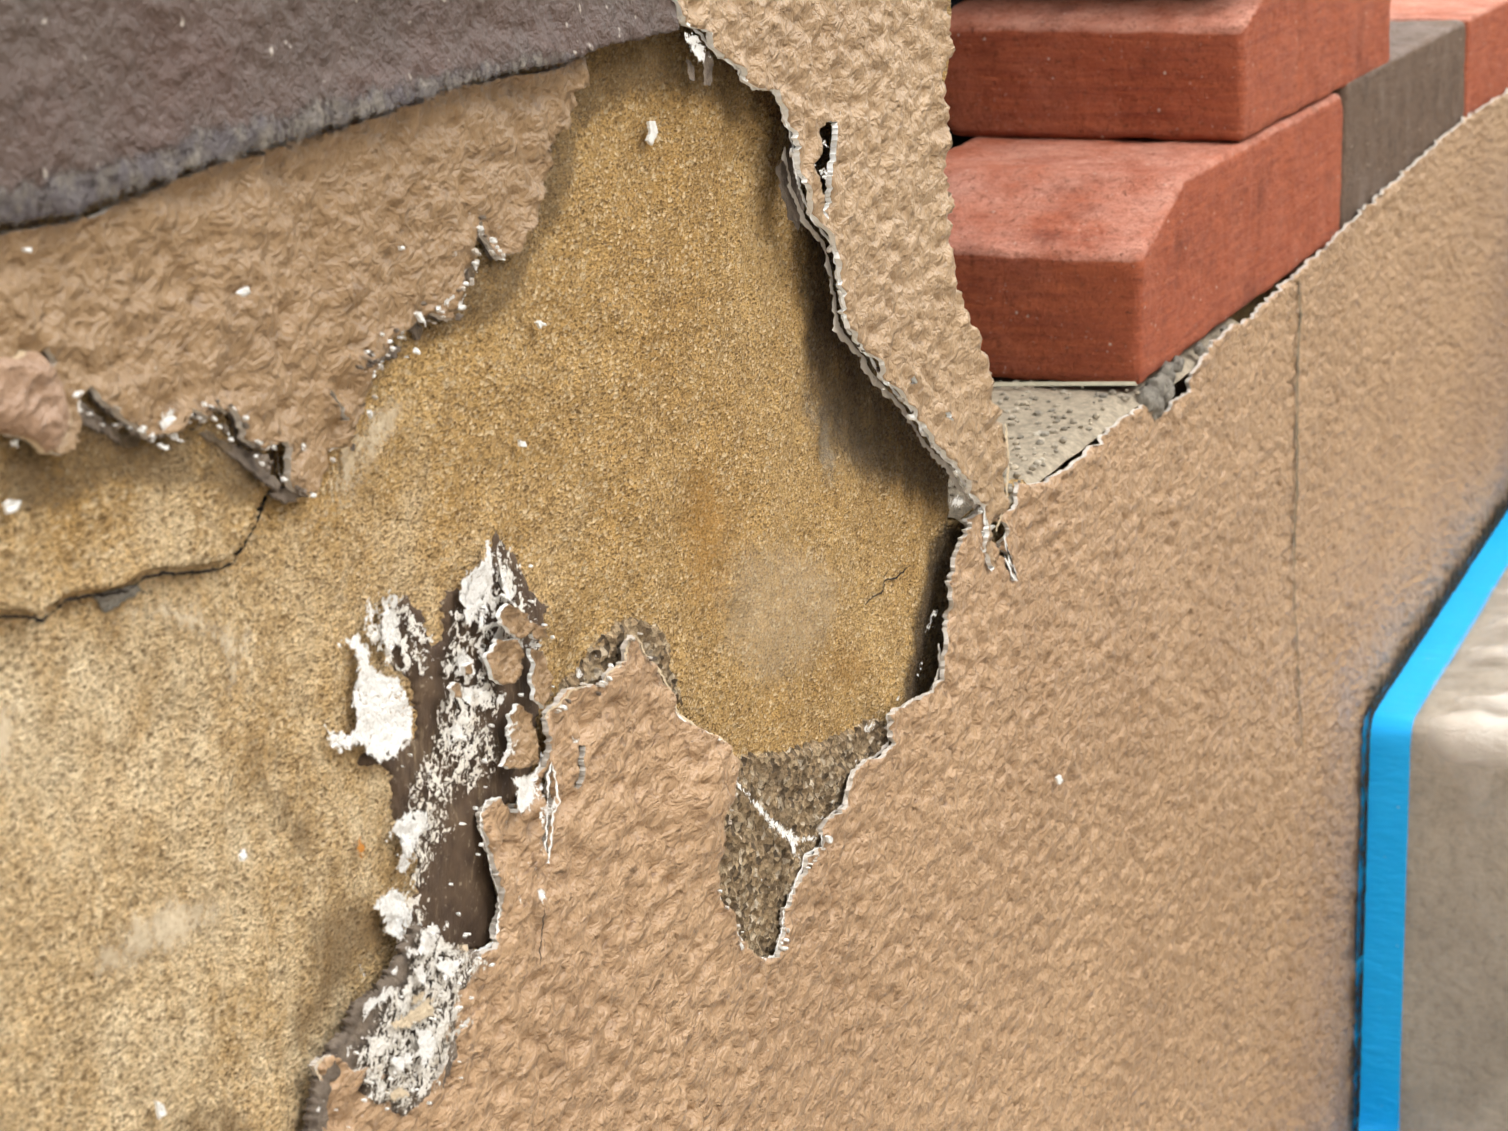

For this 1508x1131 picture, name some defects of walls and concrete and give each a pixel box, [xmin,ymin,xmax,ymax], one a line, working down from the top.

crack [0,488,271,623]
peeling [73,387,317,505]
peeling [302,0,1010,1131]
crack [1293,279,1303,752]